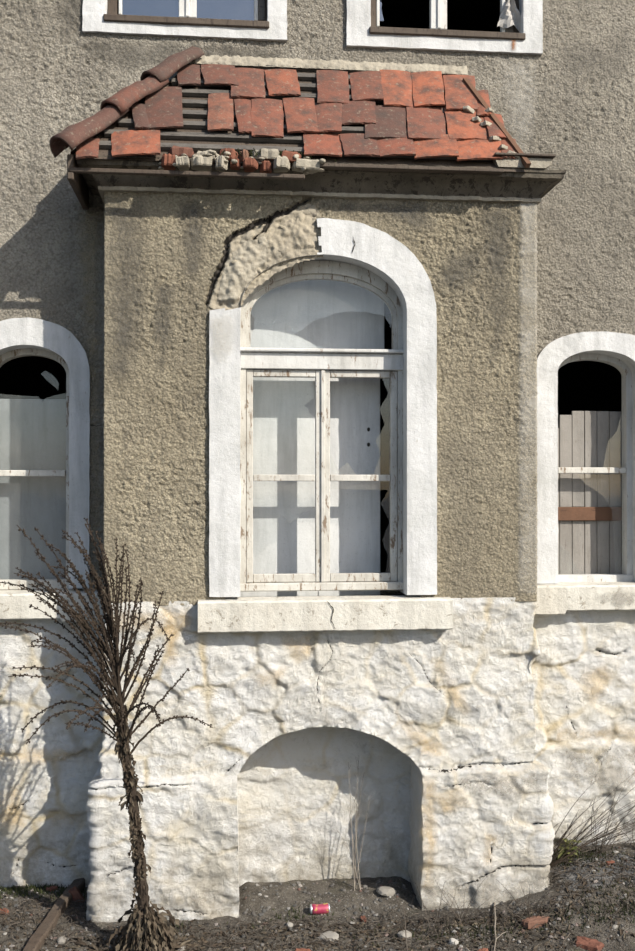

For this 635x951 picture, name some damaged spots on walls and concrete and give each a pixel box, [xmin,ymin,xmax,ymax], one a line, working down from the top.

crack [207,200,309,304]
crack [317,600,335,704]
crack [467,848,537,884]